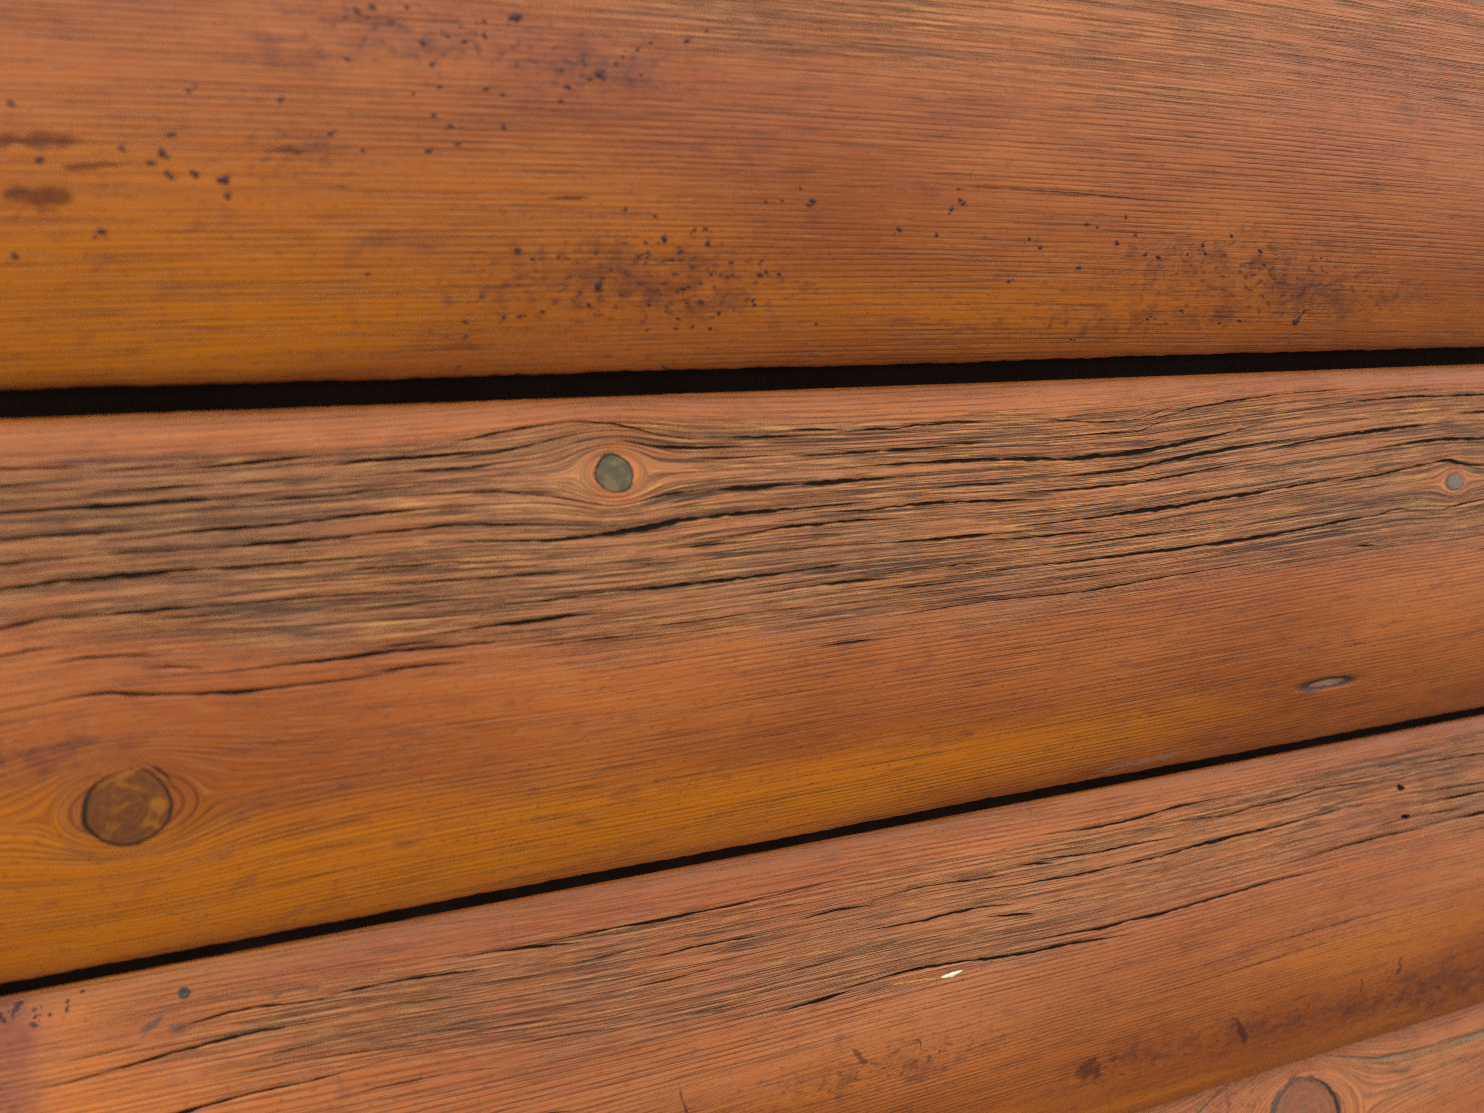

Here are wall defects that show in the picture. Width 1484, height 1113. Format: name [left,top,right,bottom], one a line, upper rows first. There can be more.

crack [0,388,1484,712]
crack [39,753,1484,1113]